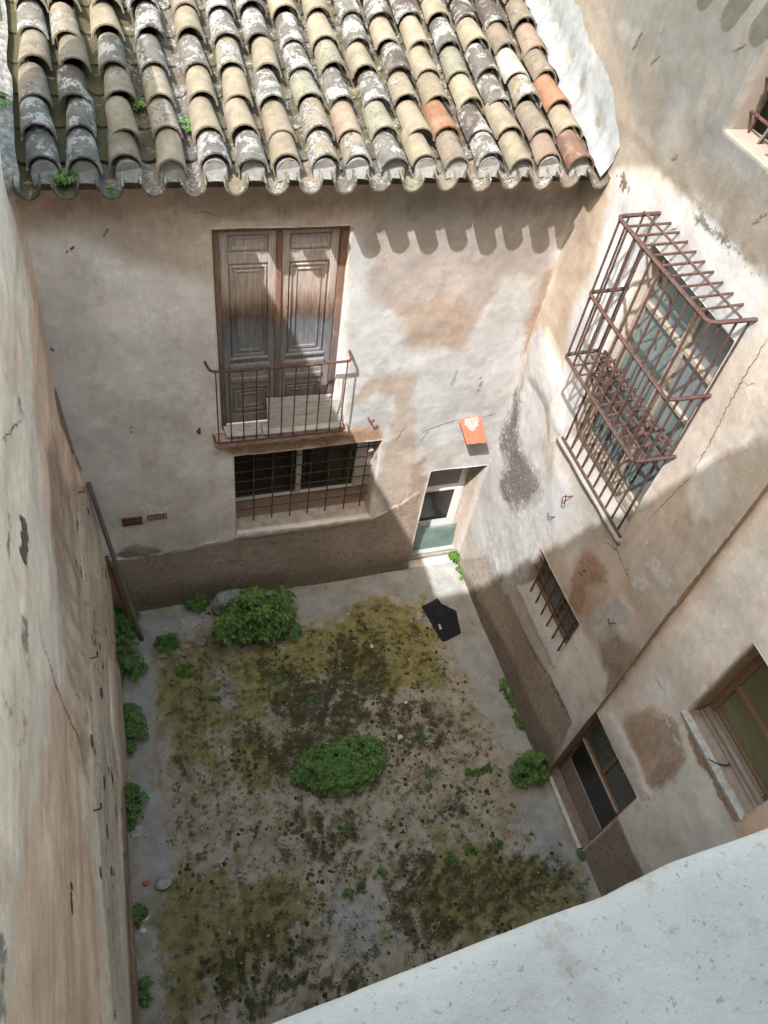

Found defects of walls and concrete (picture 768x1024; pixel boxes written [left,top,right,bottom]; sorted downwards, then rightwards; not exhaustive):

water stain [500,387,553,510]
crack [650,338,768,517]
spalling [20,515,29,565]